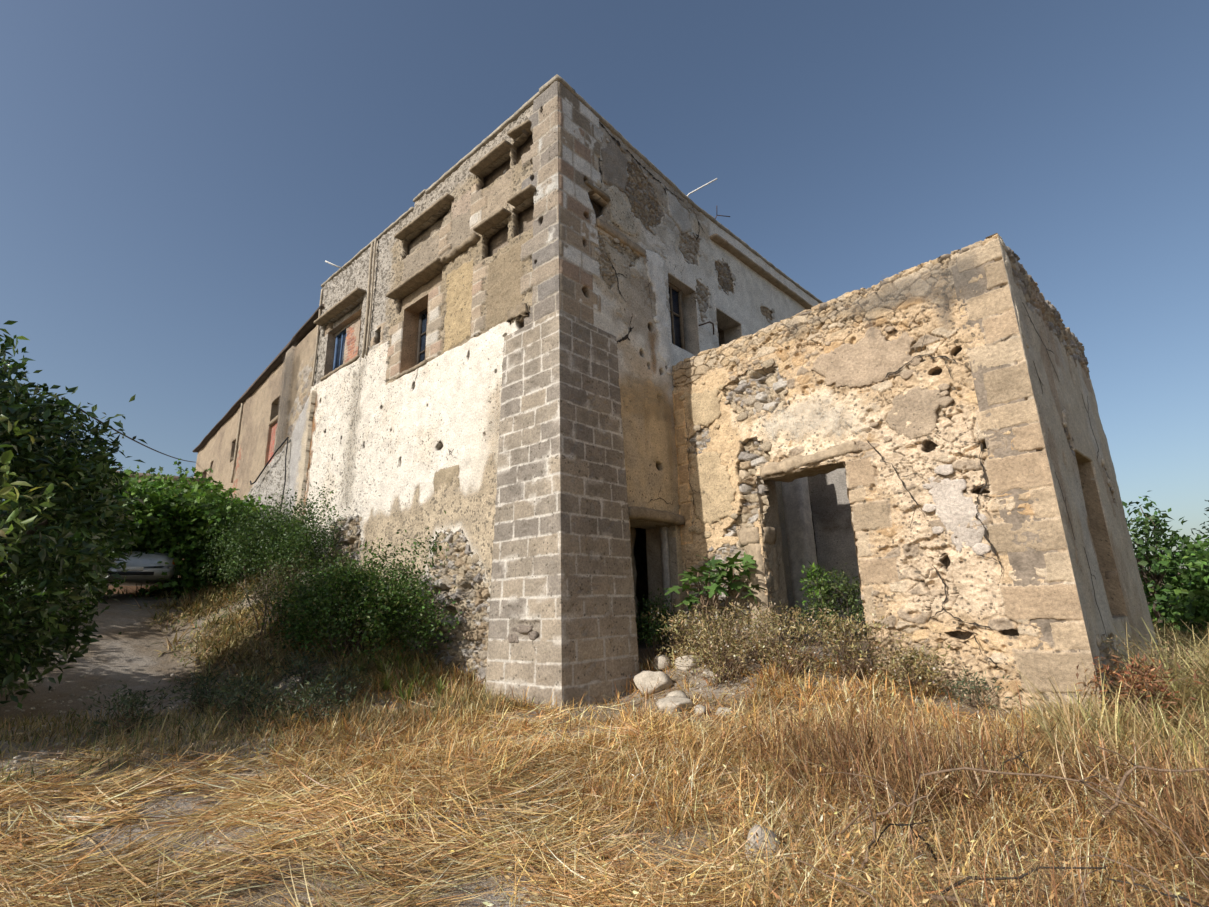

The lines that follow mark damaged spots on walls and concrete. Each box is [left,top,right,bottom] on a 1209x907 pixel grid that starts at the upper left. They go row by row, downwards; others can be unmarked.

spalling [589,121,736,376]
peeling [811,326,954,453]
water stain [360,455,497,603]
spalling [416,525,490,679]
peeling [922,464,991,568]